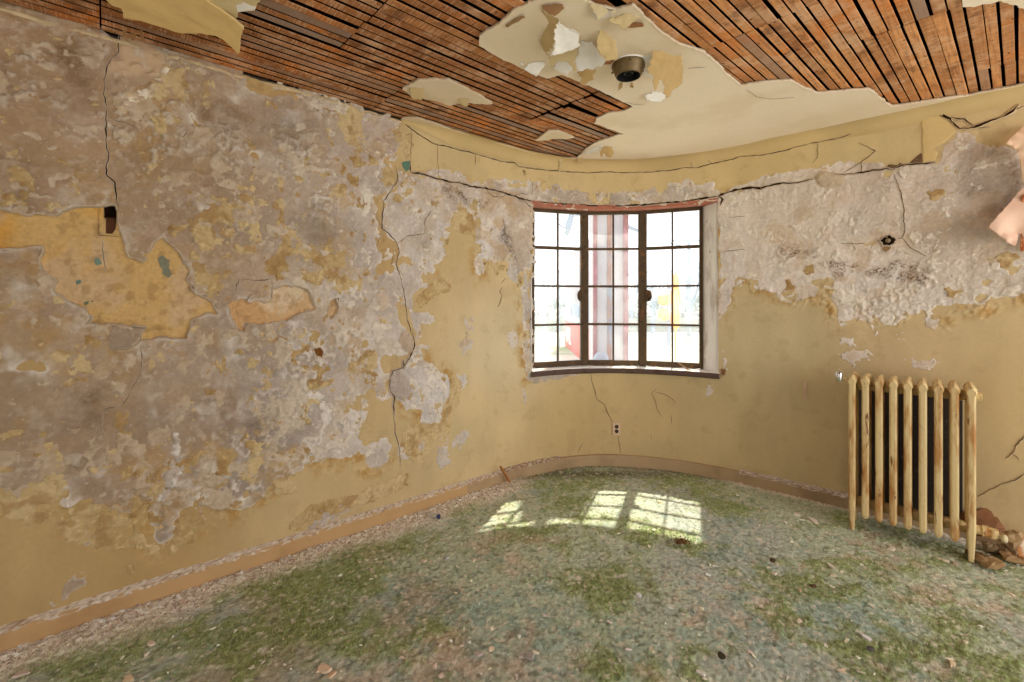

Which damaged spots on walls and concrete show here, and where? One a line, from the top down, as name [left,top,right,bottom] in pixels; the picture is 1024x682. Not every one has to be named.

water stain [0,21,106,102]
crack [89,35,140,202]
water stain [113,48,182,145]
water stain [0,321,381,519]
water stain [152,106,393,288]
flaking render [0,0,594,555]
water stain [294,86,348,115]
water stain [324,279,447,423]
peeling [520,3,644,85]
peeling [618,50,684,102]
crack [372,124,936,467]
flaking render [596,132,1024,326]